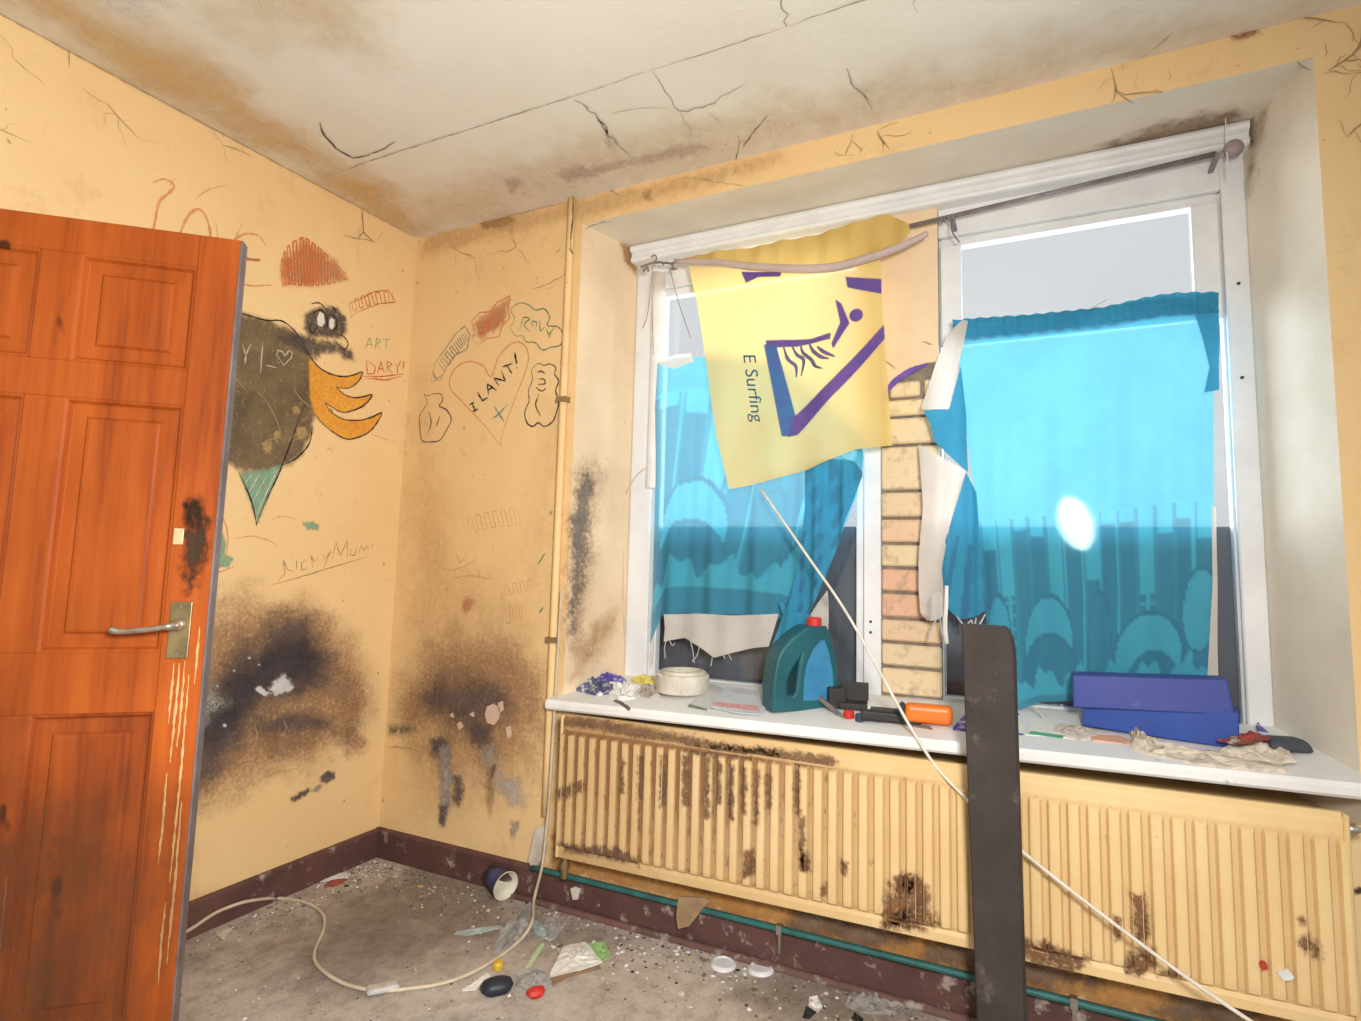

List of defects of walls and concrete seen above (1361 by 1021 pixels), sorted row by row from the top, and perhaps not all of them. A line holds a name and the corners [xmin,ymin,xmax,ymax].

water stain [38,0,311,155]
crack [0,0,866,259]
crack [834,69,912,156]
crack [1296,17,1361,142]
water stain [323,177,407,229]
crack [446,190,622,289]
water stain [569,474,593,632]
rust [556,717,835,872]
rust [552,835,975,973]
rust [1025,893,1293,1021]